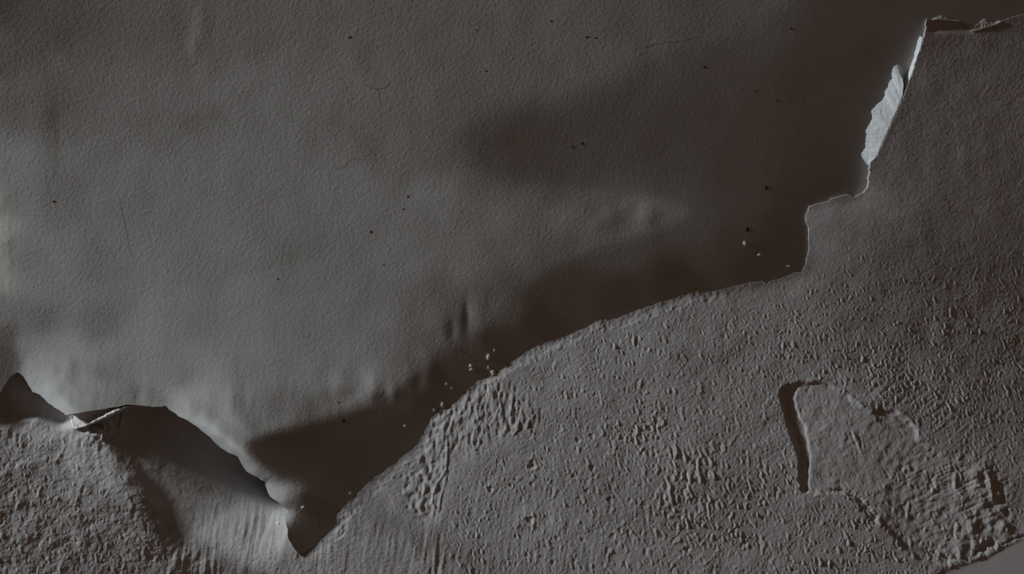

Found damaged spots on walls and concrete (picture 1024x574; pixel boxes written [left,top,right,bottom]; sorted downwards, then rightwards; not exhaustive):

peeling [903,36,923,92]
peeling [17,343,84,415]
spalling [455,290,723,404]
spalling [104,401,281,548]
peeling [265,474,306,525]
spalling [412,376,541,520]
spalling [780,378,1012,566]